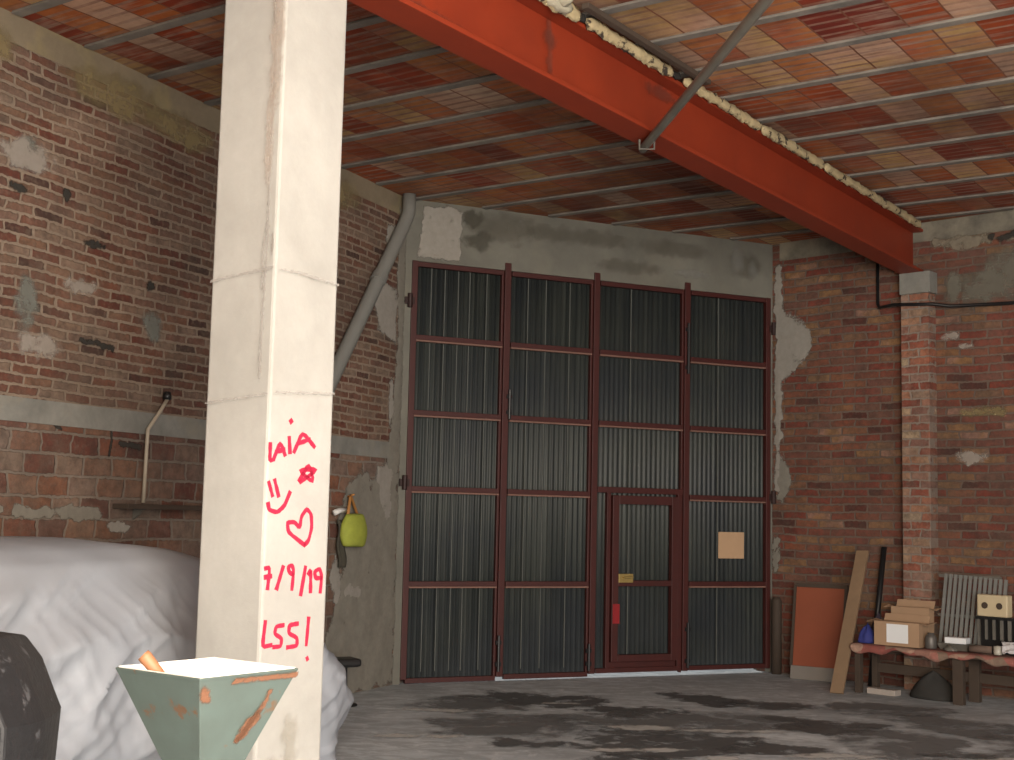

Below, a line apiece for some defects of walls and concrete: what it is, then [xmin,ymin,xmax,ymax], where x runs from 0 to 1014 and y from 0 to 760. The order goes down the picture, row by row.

spalling [948,230,1014,251]
peeling [376,462,393,520]